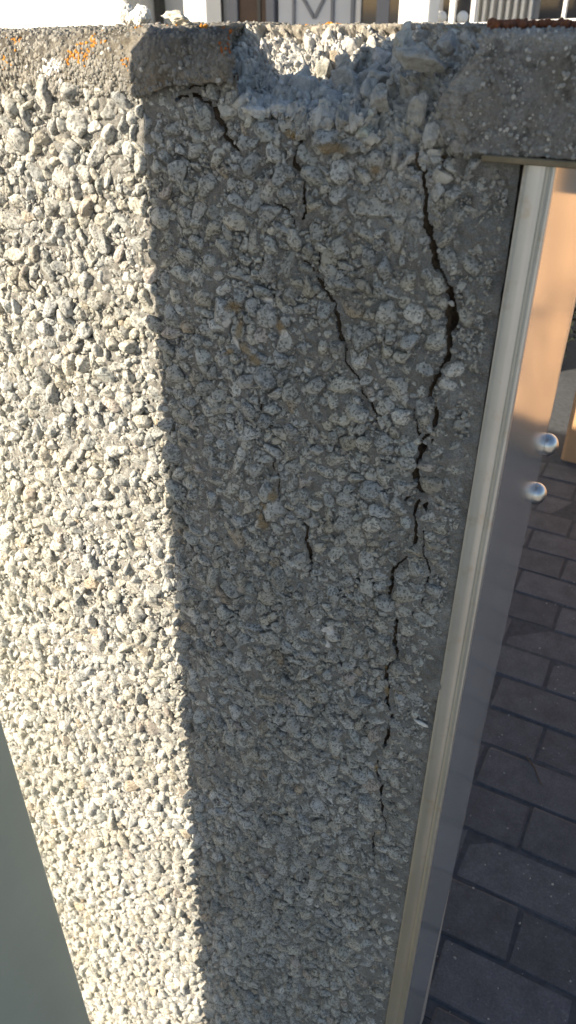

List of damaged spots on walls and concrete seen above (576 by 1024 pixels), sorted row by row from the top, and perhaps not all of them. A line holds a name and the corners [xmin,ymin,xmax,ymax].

crack [178,73,240,151]
crack [275,140,307,227]
spalling [231,20,487,186]
crack [304,252,378,421]
crack [388,152,459,602]
crack [303,519,313,572]
crack [372,619,399,845]